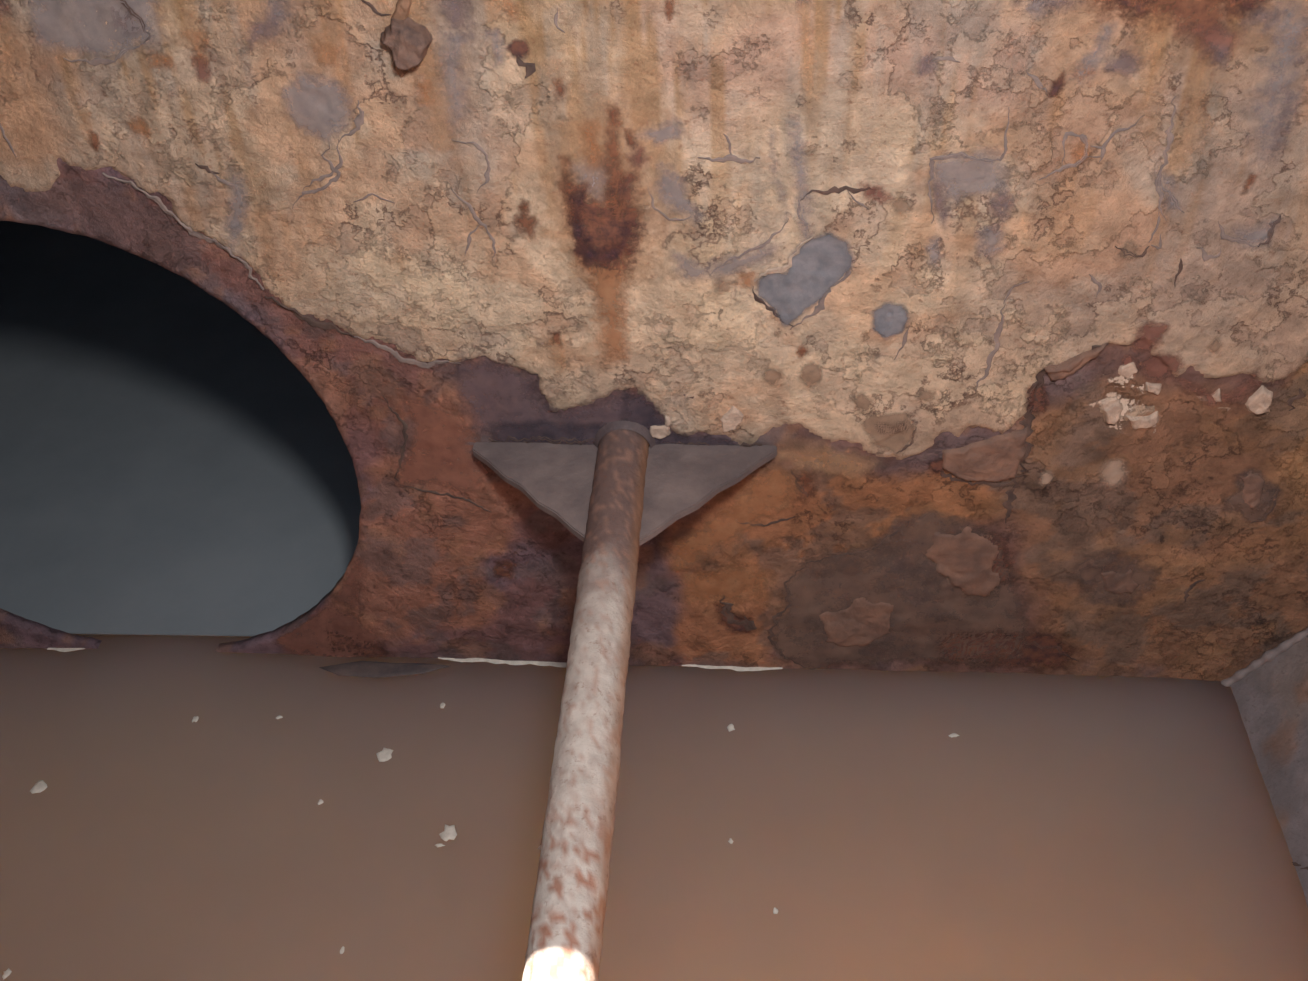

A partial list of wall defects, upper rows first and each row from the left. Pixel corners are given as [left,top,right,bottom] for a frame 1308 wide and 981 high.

rust [1098,0,1265,60]
crack [0,123,17,180]
crack [195,163,243,206]
crack [292,139,394,209]
crack [451,139,496,261]
rust [515,203,536,236]
rust [561,109,645,358]
peeling [0,0,1308,524]
peeling [925,526,1000,597]
spalling [716,561,808,669]
peeling [819,597,894,647]